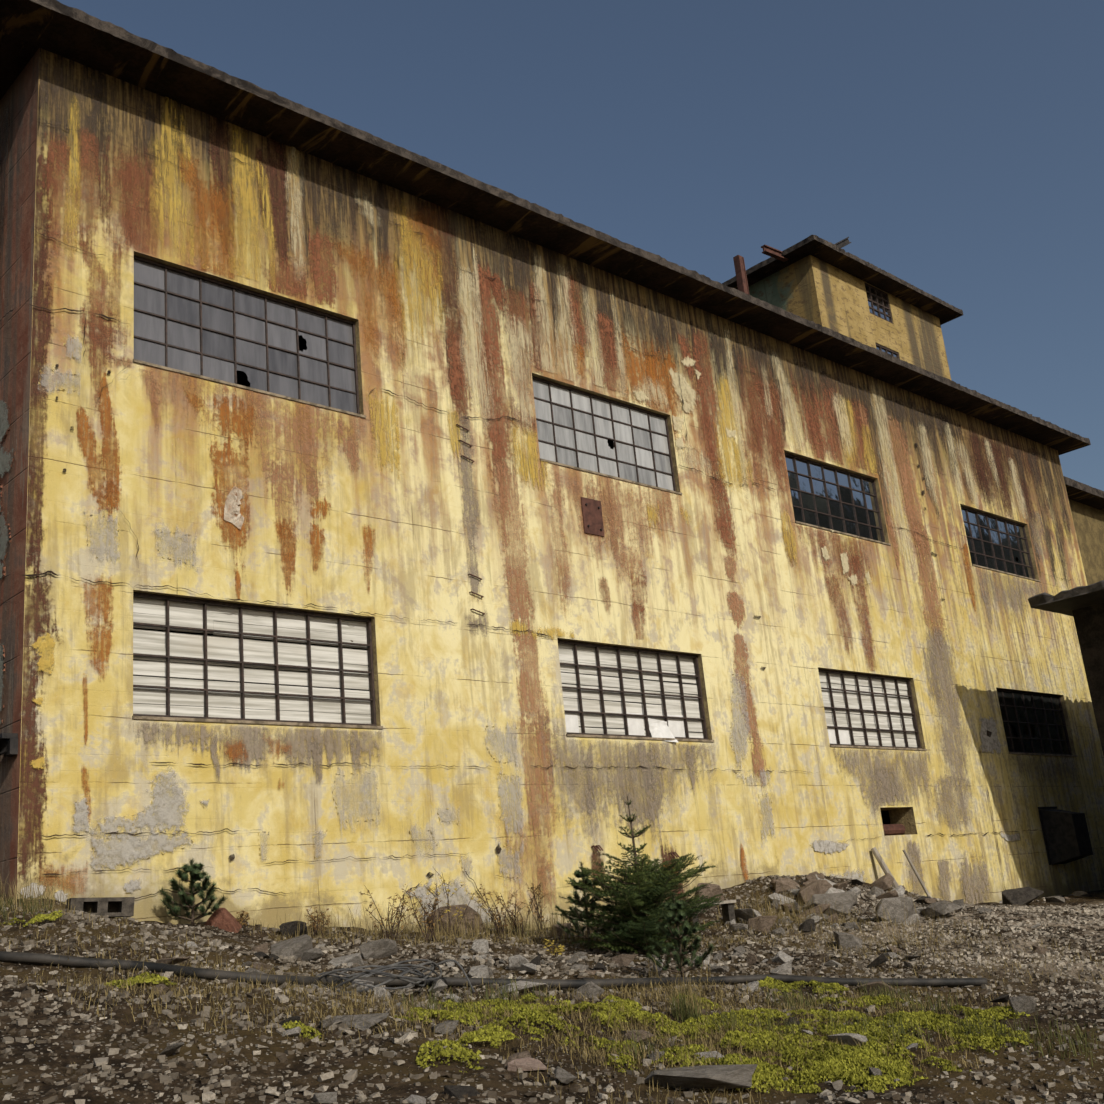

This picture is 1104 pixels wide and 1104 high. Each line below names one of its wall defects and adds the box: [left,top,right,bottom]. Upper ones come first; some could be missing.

corrosion [47,130,160,519]
peeling [0,400,16,579]
spalling [224,486,244,530]
corrosion [235,563,243,599]
corrosion [177,375,363,587]
corrosion [363,526,374,590]
corrosion [446,264,558,836]
leakage [18,48,1075,879]
corrosion [563,275,766,784]
crack [21,828,239,837]
peeling [73,770,209,872]
crack [266,853,515,910]